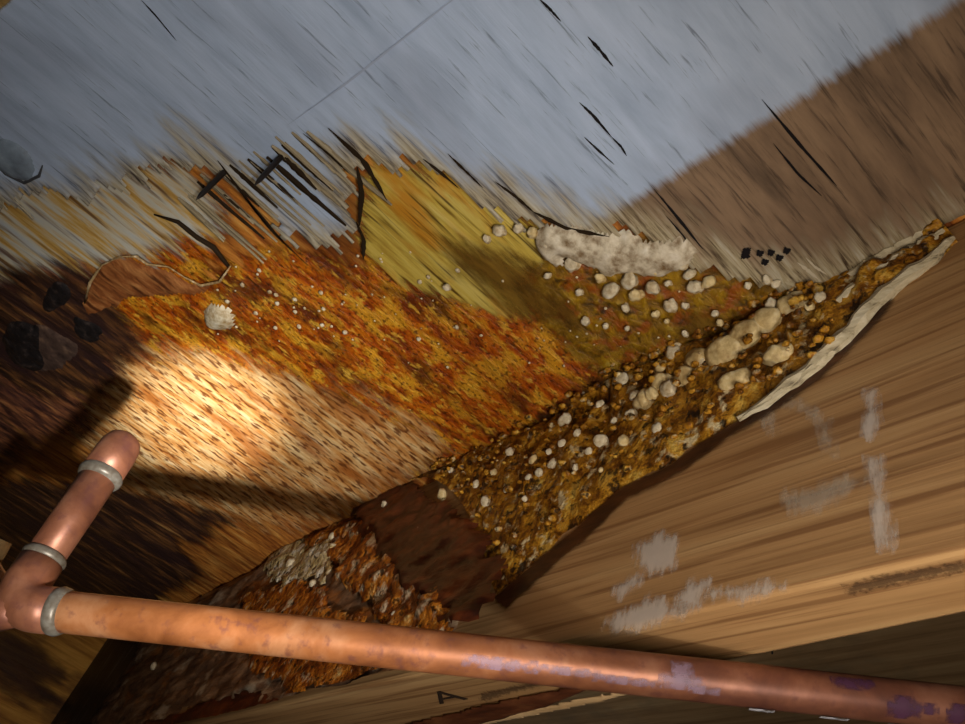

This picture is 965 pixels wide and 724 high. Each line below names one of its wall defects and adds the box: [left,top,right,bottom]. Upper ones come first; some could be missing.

peeling [82,214,231,314]
water stain [0,161,787,600]
water stain [614,580,716,630]